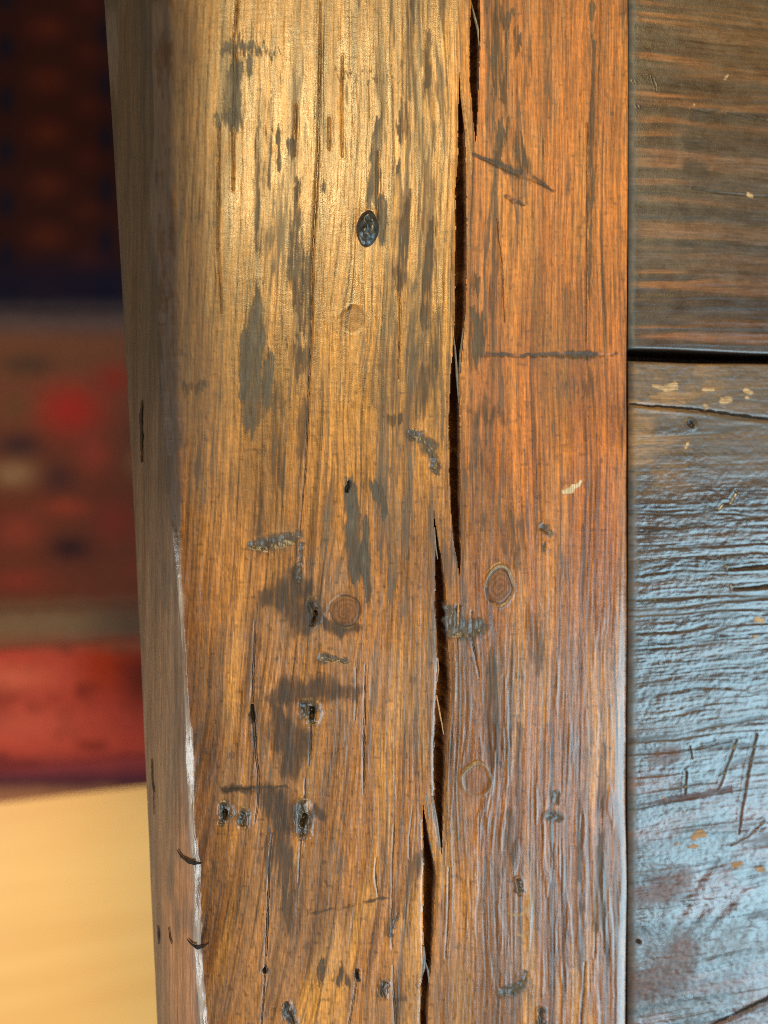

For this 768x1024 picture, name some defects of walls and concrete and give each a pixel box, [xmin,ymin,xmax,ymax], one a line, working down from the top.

crack [375,0,481,1024]
crack [497,225,505,322]